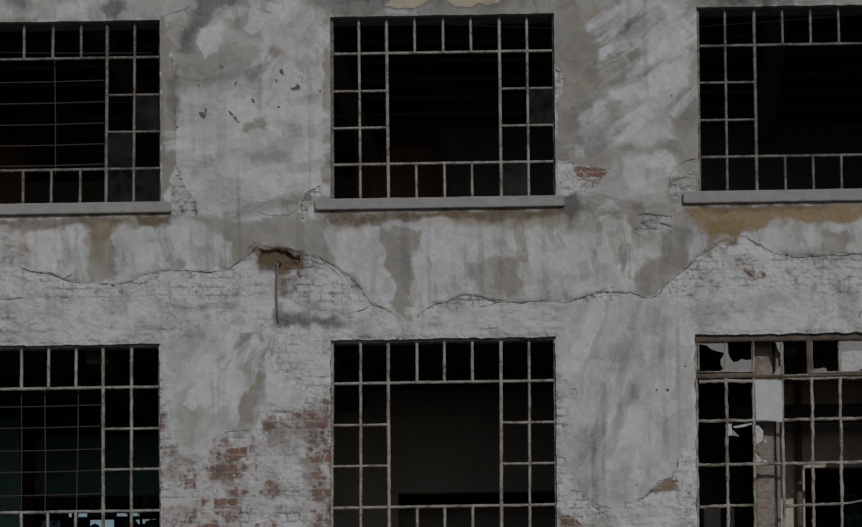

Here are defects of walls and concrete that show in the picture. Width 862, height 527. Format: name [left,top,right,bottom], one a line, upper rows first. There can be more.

peeling [555,13,614,196]
peeling [88,226,117,283]
crack [22,244,385,312]
peeling [223,219,326,271]
crack [417,241,726,329]
peeling [743,268,766,280]
crack [749,231,862,258]
peeling [161,413,331,527]
flaking render [650,478,679,493]